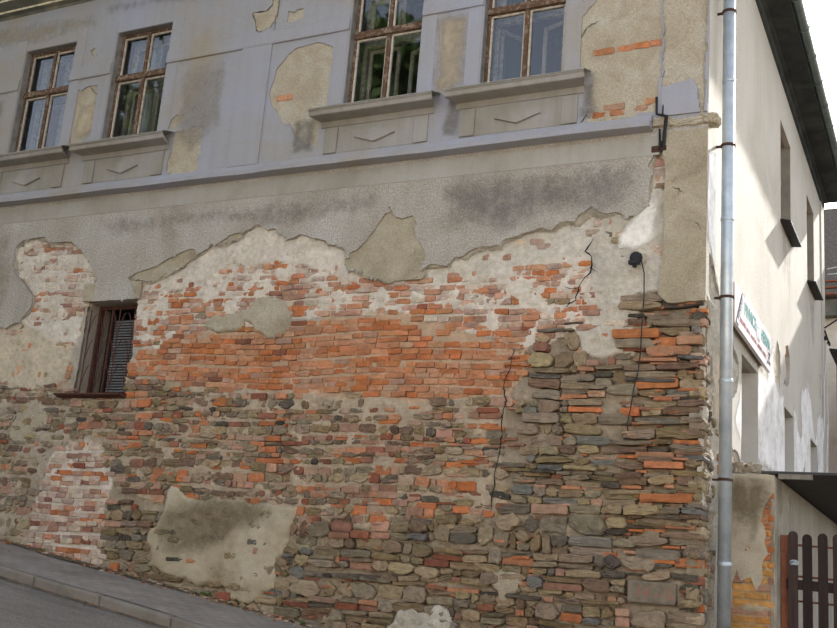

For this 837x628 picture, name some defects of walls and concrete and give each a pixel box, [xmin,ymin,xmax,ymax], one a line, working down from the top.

spalling [165,127,202,175]
spalling [270,43,333,147]
spalling [581,0,710,122]
spalling [0,142,720,628]
spalling [773,341,791,385]
spalling [731,494,774,628]